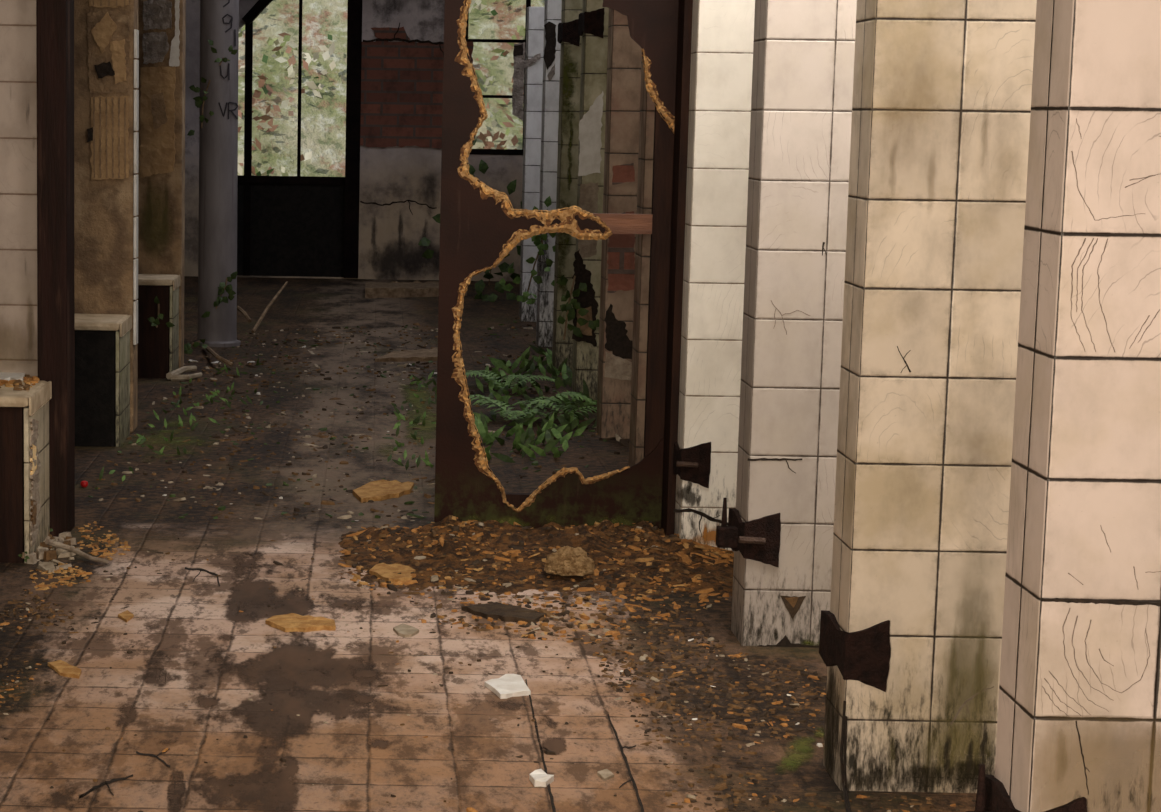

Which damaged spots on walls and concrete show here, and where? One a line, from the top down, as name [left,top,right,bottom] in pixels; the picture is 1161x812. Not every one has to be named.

flaking render [360,27,444,149]
crack [360,200,437,215]
spalling [578,92,635,213]
crack [1071,118,1160,352]
spalling [572,234,635,381]
water stain [225,552,365,623]
water stain [143,651,176,687]
water stain [167,631,398,812]
water stain [824,666,839,775]
water stain [847,723,990,792]
crack [1042,573,1150,795]
water stain [1048,740,1161,812]